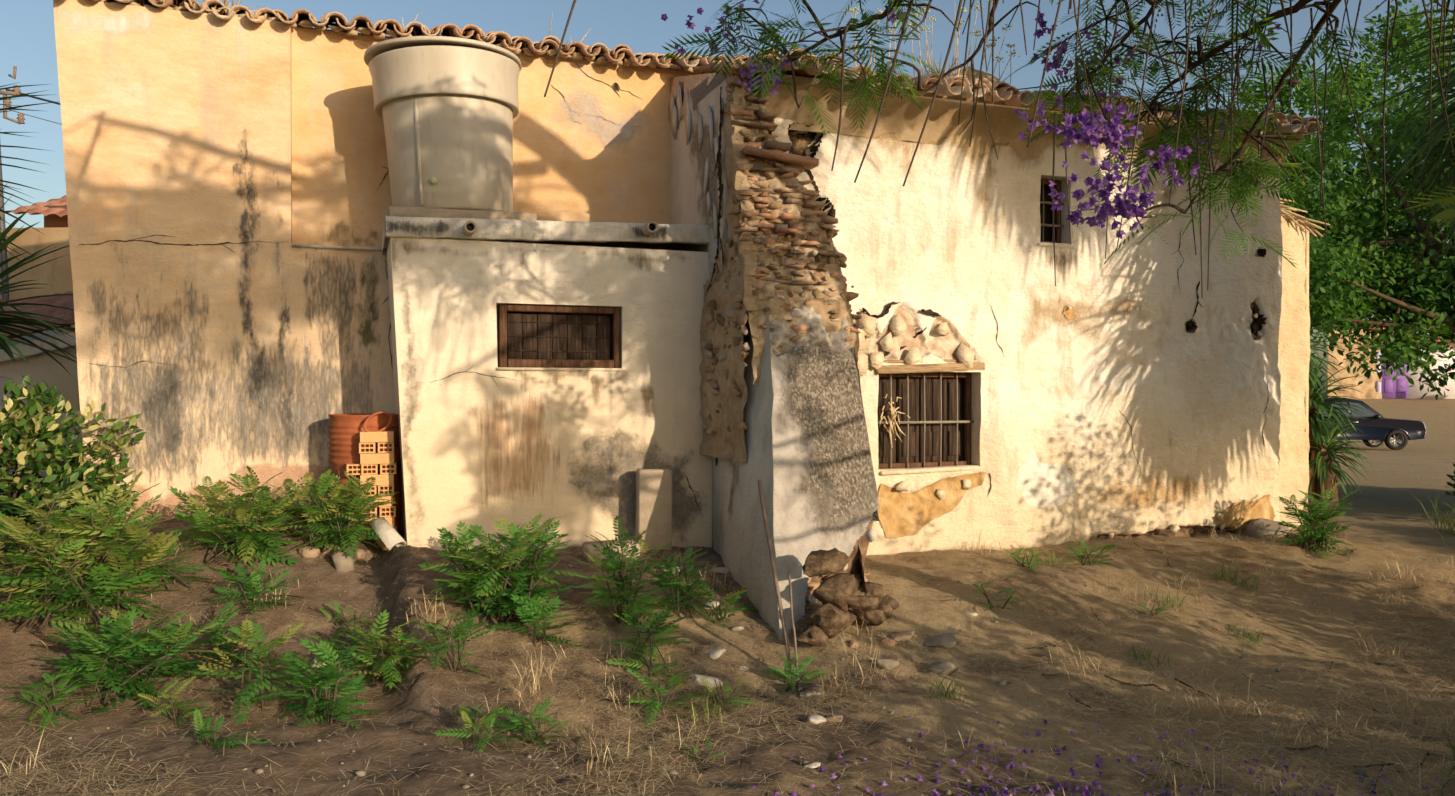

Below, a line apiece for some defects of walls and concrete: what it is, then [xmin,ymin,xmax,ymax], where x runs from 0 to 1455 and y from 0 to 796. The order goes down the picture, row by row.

water stain [90,288,216,478]
water stain [227,144,378,463]
spalling [668,59,978,435]
water stain [572,432,700,540]
spalling [804,472,986,607]